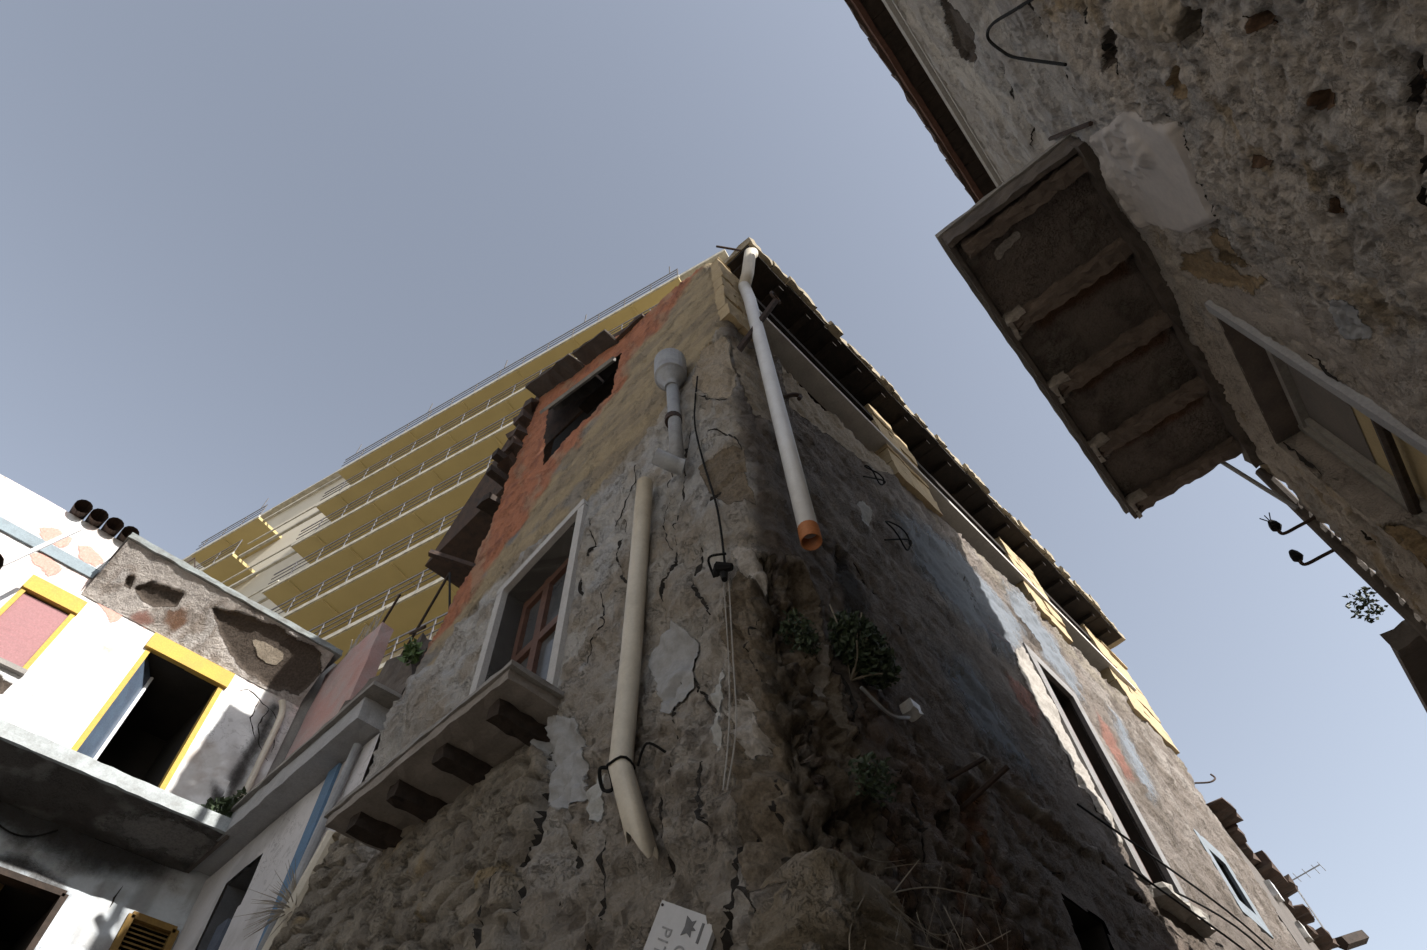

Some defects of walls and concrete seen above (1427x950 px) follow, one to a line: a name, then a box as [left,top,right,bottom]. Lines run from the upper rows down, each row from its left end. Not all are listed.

flaking render [1110,0,1202,47]
flaking render [1242,10,1278,34]
flaking render [1165,65,1188,100]
flaking render [1306,89,1335,111]
flaking render [1251,154,1273,169]
flaking render [1327,196,1344,214]
flaking render [1180,227,1267,296]
flaking render [124,576,184,607]
flaking render [212,608,322,696]